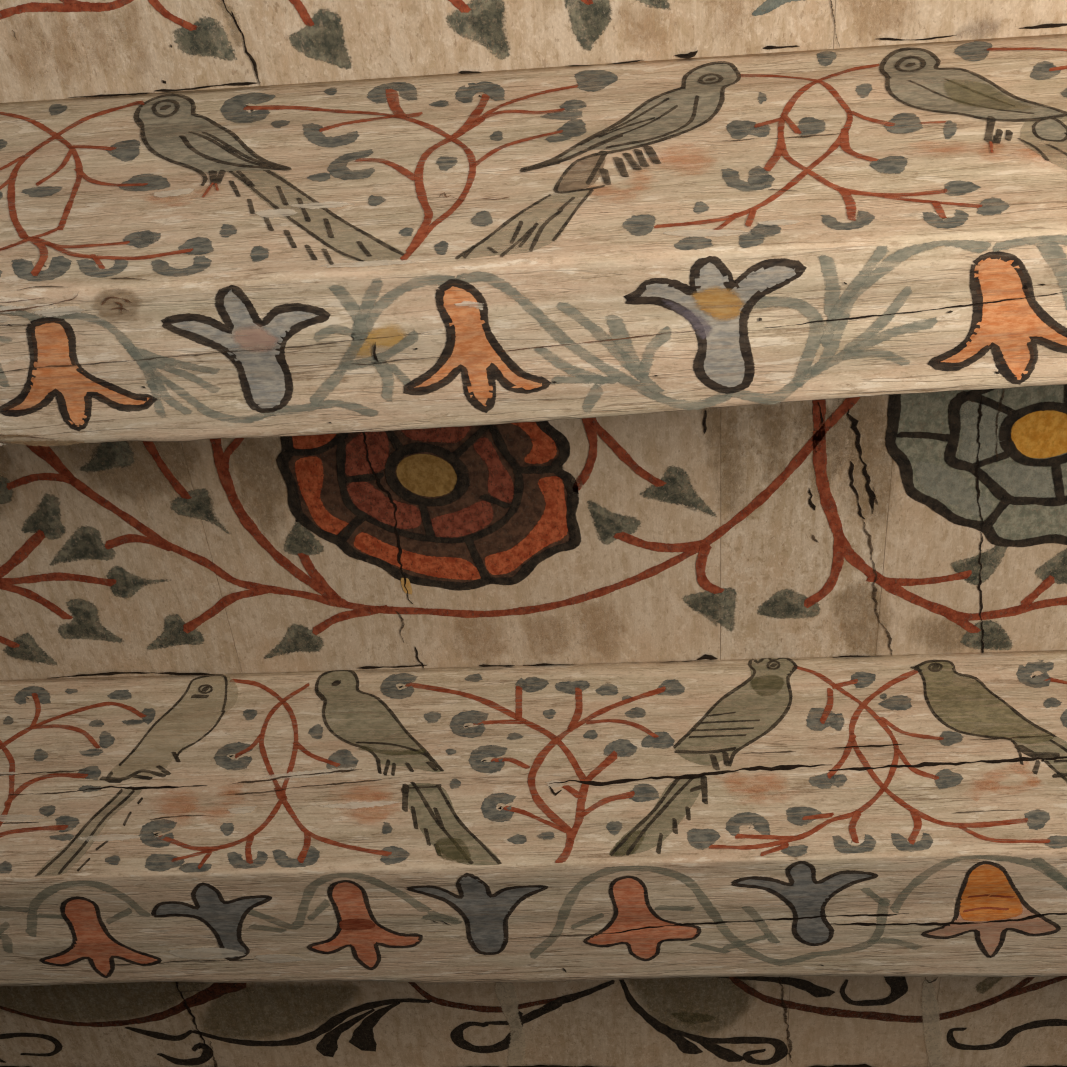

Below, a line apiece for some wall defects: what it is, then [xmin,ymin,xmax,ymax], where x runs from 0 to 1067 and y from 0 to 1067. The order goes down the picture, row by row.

crack [1020,22,1067,30]
crack [877,34,955,42]
crack [69,0,260,98]
crack [763,43,799,51]
crack [675,50,698,58]
crack [975,390,1005,653]
crack [818,402,893,658]
crack [358,432,427,669]
crack [682,654,718,662]
crack [479,661,570,669]
crack [52,671,216,679]
crack [546,735,1067,796]